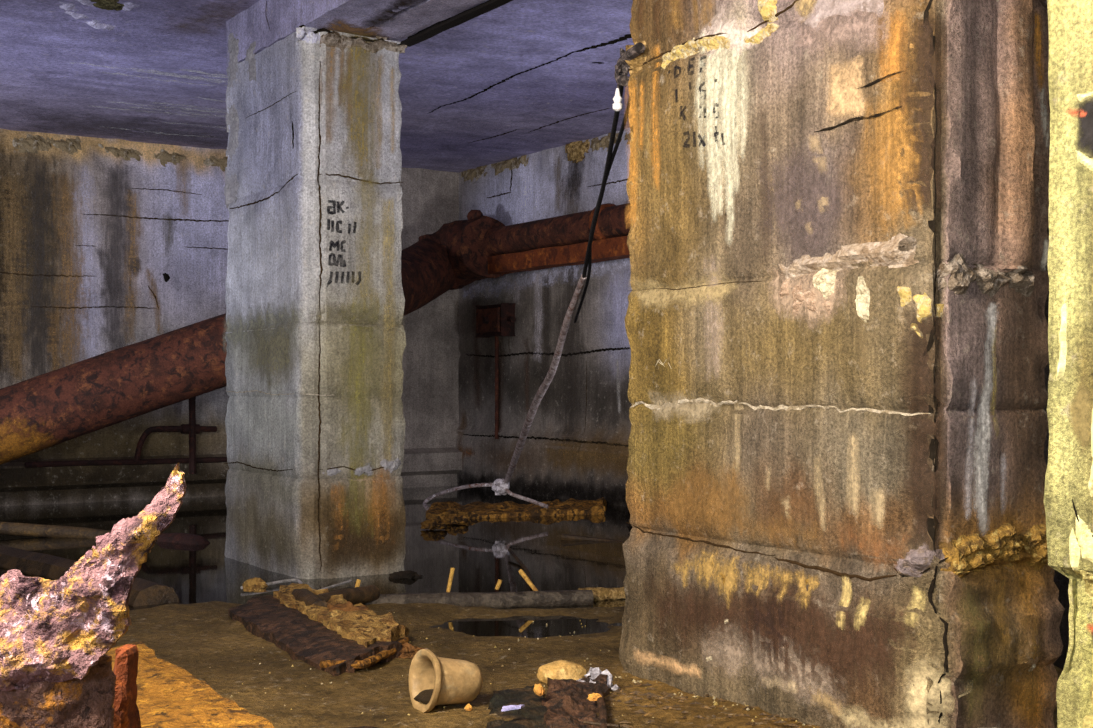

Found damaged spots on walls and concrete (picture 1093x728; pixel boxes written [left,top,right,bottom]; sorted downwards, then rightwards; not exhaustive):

crack [429,34,632,113]
crack [628,0,799,70]
damp [661,0,779,187]
crack [815,106,902,132]
damp [913,21,940,204]
damp [591,259,759,332]
corrosion [0,421,52,465]
damp [466,266,629,468]
crack [926,83,949,723]
damp [897,287,1048,578]
corrosion [328,476,399,565]
crack [625,522,897,581]